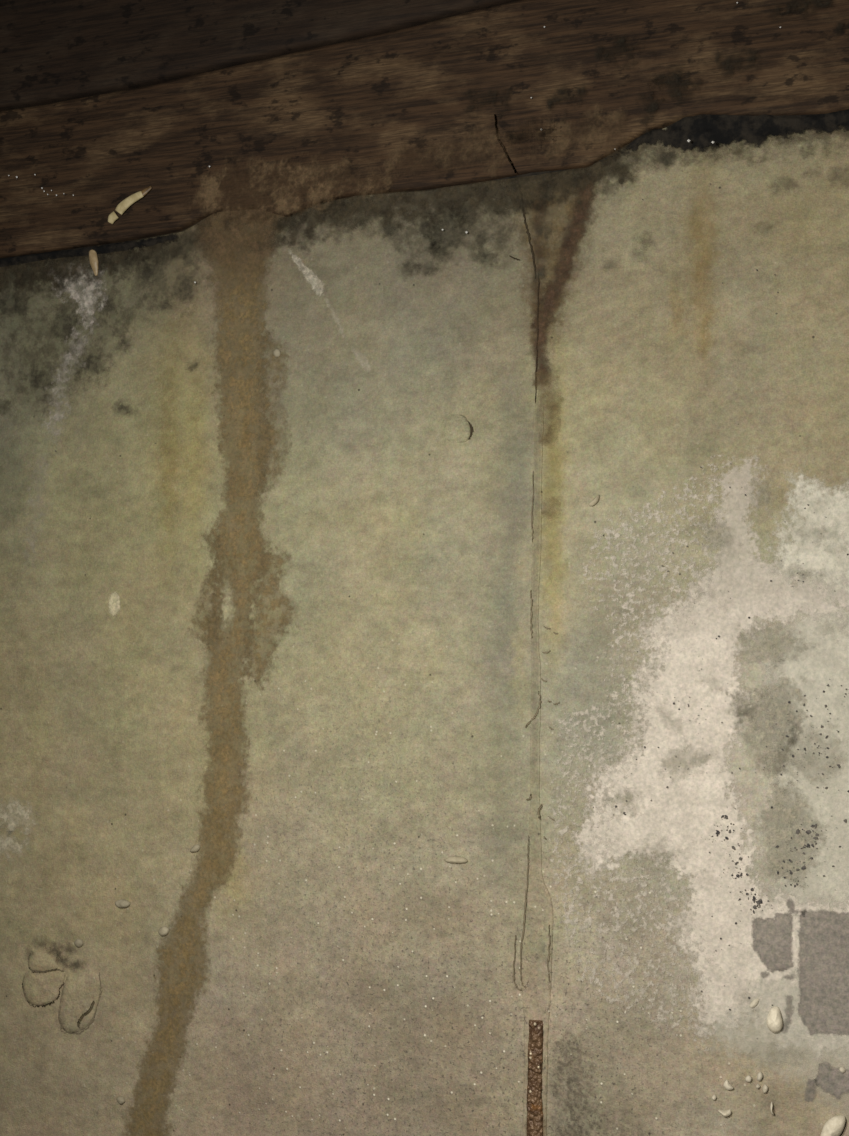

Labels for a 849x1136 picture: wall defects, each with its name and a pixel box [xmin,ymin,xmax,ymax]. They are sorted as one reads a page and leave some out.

crack [494,114,516,173]
crack [509,204,539,401]
crack [528,473,536,540]
damp [0,143,675,1136]
crack [525,591,560,730]
peeling [549,455,849,1101]
damp [766,679,849,796]
crack [513,794,554,991]
damp [701,808,772,915]
damp [776,814,846,892]